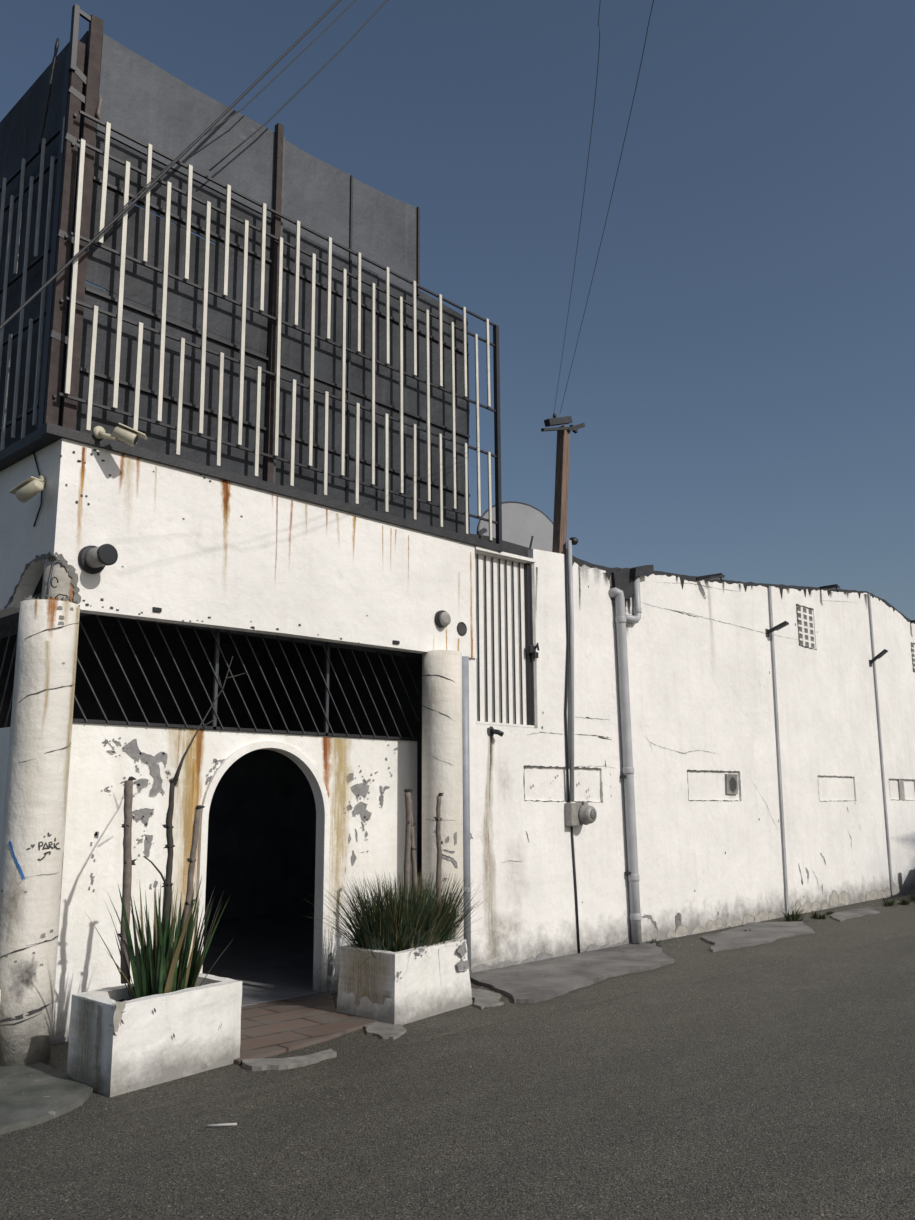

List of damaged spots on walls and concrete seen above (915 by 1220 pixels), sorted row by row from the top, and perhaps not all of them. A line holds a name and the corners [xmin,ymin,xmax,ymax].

spalling [4,551,119,625]
rust [35,587,79,746]
peeling [101,737,179,858]
rust [182,729,203,882]
rust [323,737,347,879]
peeling [344,744,398,873]